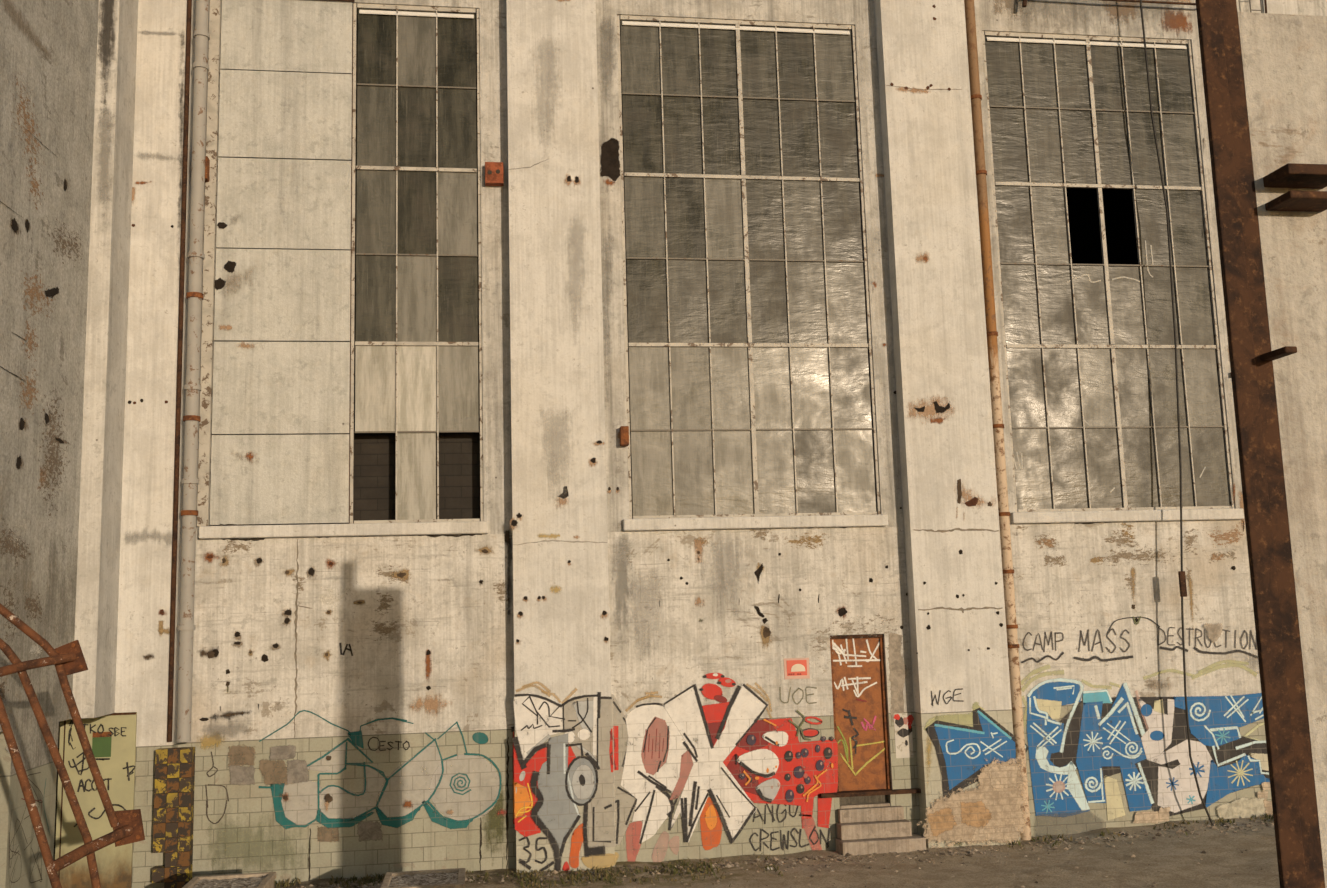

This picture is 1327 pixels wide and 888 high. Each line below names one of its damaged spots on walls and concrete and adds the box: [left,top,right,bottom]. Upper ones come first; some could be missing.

rust [956,479,993,518]
peeling [1016,525,1068,567]
peeling [1090,523,1244,589]
peeling [917,756,1029,848]